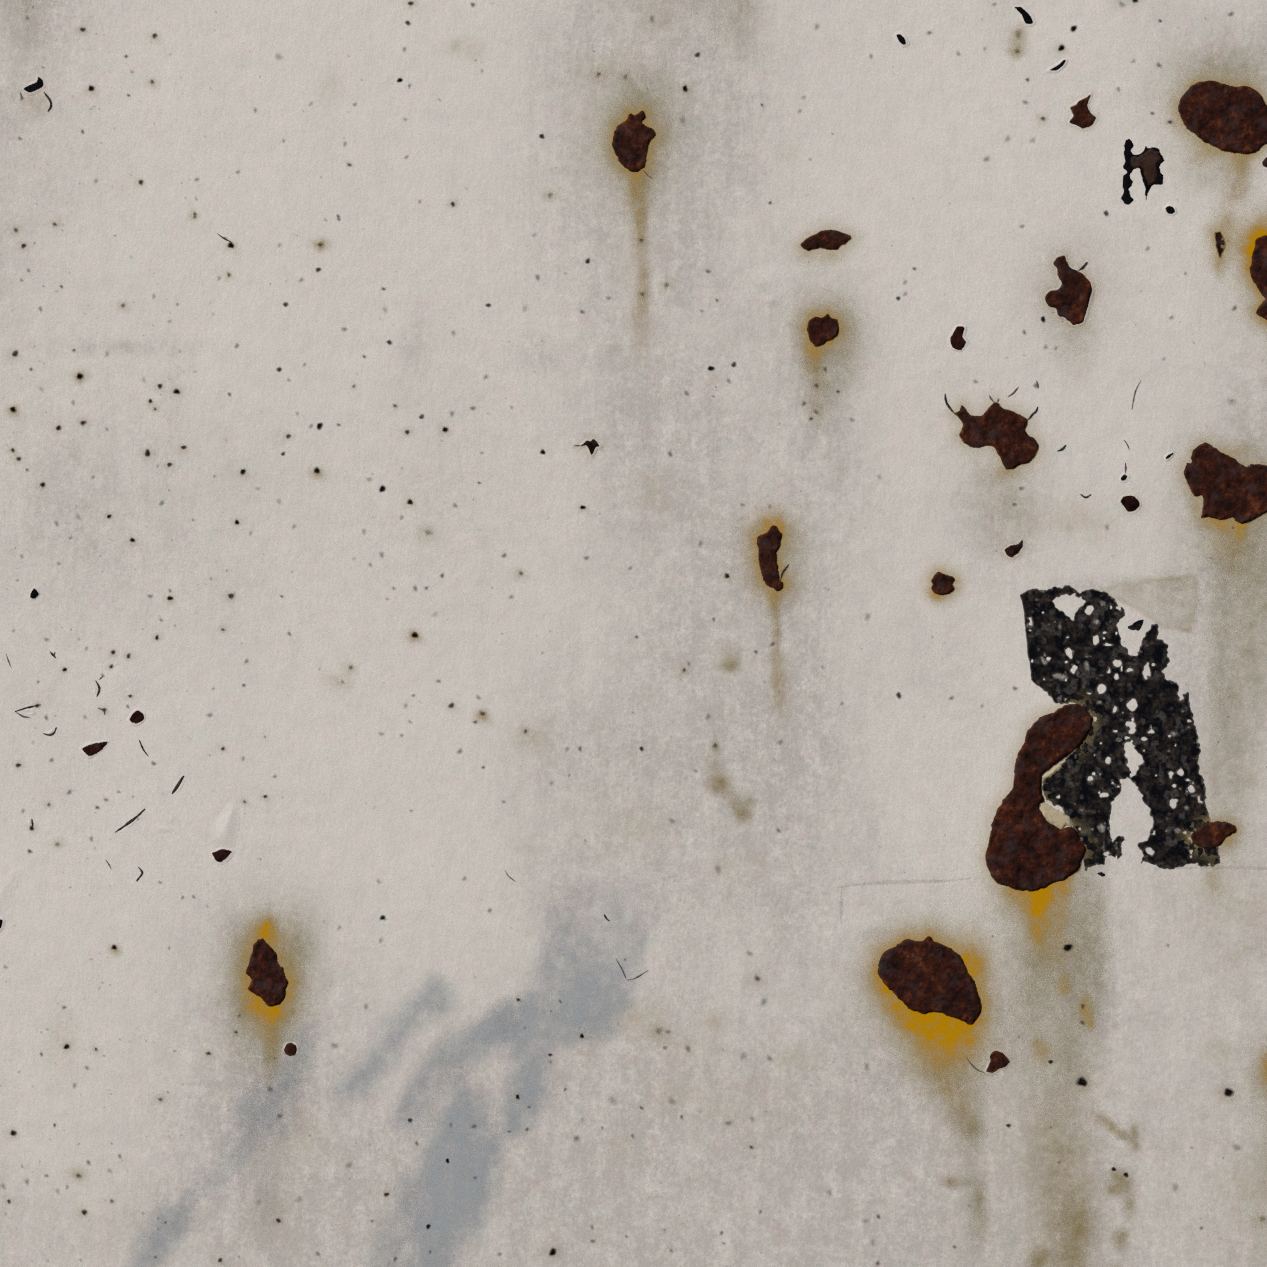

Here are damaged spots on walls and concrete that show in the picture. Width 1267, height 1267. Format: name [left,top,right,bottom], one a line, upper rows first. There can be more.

rust [1168,67,1267,165]
rust [610,94,657,241]
rust [801,229,851,251]
rust [1041,253,1094,327]
rust [1239,219,1267,325]
rust [944,394,1039,473]
rust [1184,442,1267,541]
rust [752,517,789,616]
peeling [1128,620,1143,631]
rust [985,704,1093,947]
rust [233,917,302,1041]
rust [870,930,989,1094]